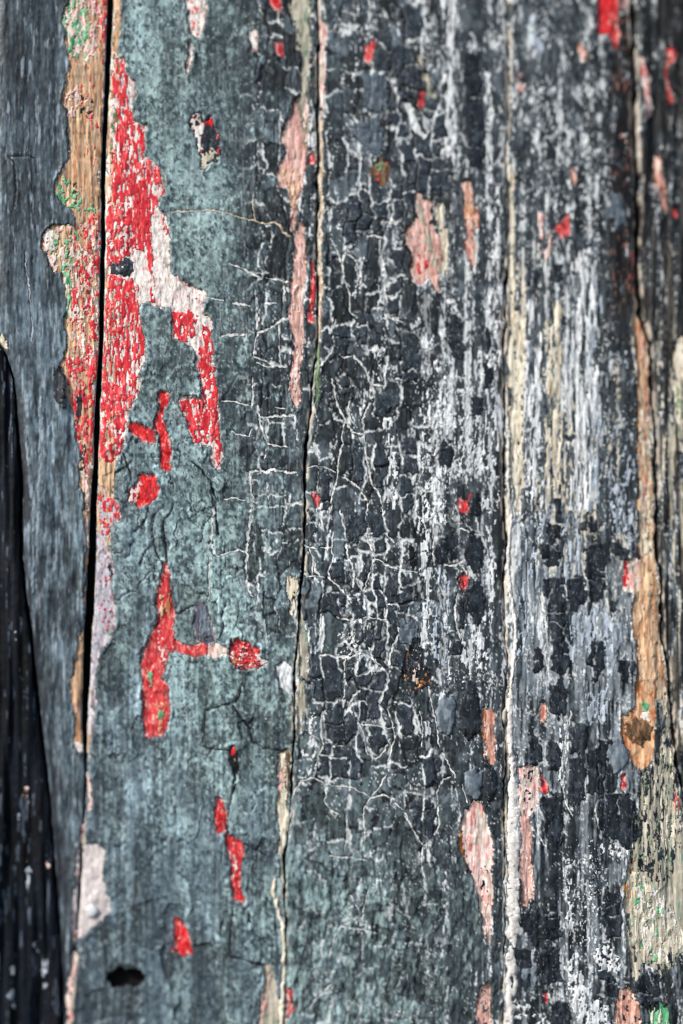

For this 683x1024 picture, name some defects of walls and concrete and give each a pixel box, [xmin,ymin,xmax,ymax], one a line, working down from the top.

crack [385,88,393,153]
peeling [41,0,224,754]
crack [174,196,468,866]
peeling [140,0,683,1024]
crack [539,534,587,669]
crack [540,710,601,831]
peeling [65,823,111,1024]
crack [329,890,376,956]